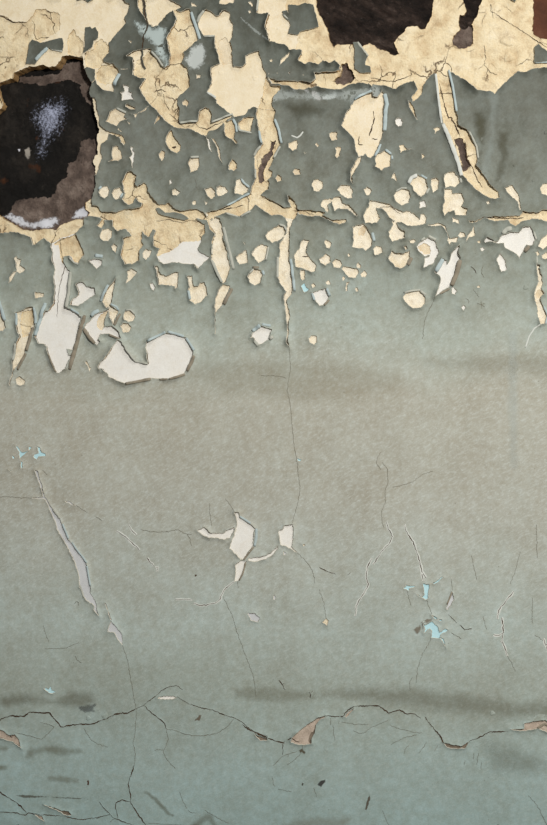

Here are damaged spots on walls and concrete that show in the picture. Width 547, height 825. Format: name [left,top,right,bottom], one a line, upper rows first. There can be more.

water stain [18,101,65,159]
water stain [5,213,58,228]
flaking render [0,0,547,386]
peeling [197,512,305,582]
spalling [403,577,444,600]
crack [0,648,303,825]
crack [325,704,445,753]
crack [464,730,508,765]